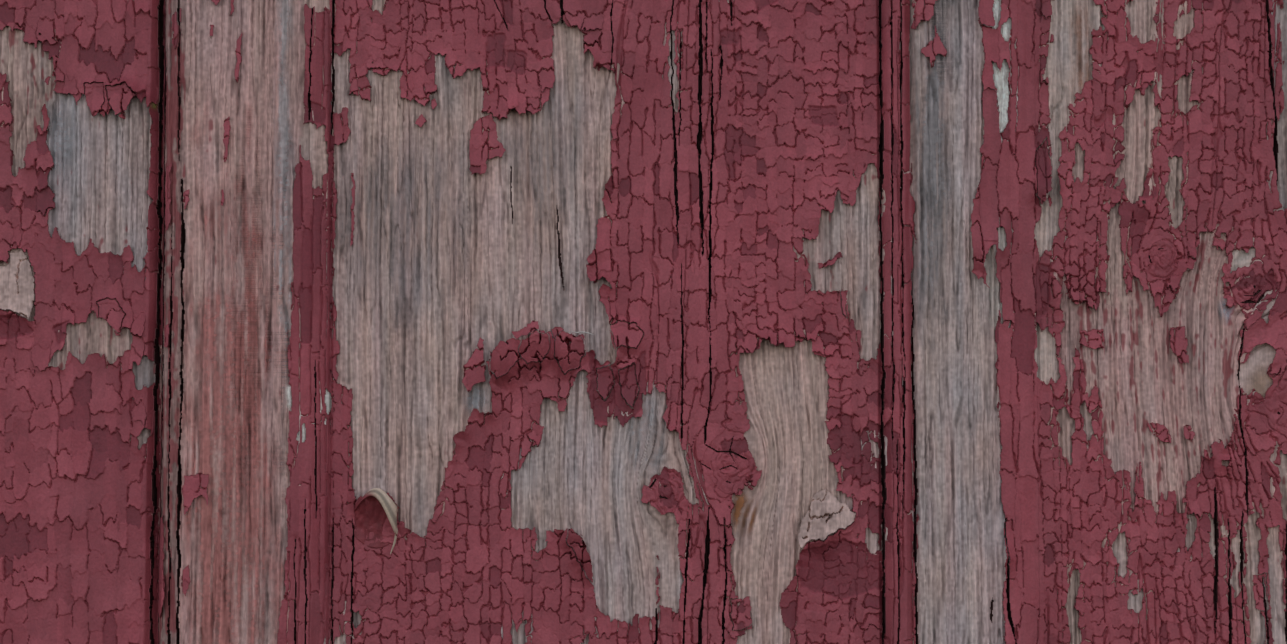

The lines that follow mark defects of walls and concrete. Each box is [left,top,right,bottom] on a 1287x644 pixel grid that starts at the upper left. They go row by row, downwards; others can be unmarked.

crack [149,0,186,644]
crack [308,0,335,135]
crack [294,360,355,644]
peeling [0,0,1019,644]
crack [544,0,564,23]
crack [556,210,564,291]
crack [649,0,752,644]
crack [878,0,918,644]
crack [990,519,1017,644]
peeling [1034,0,1287,644]
crack [1213,285,1287,644]
crack [1266,0,1278,181]